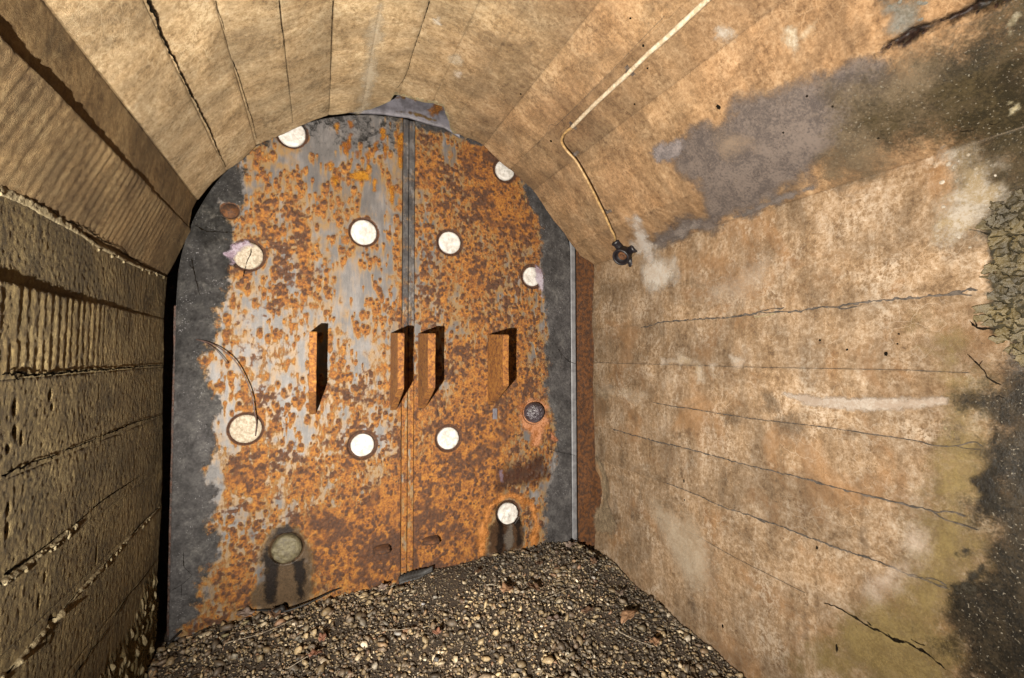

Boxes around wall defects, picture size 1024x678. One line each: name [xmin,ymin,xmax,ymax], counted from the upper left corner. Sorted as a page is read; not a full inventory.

crack [147,0,226,167]
rust [327,121,404,191]
leakage [631,0,1024,290]
crack [641,288,999,330]
peeling [971,188,1024,367]
rust [476,399,558,556]
crack [610,428,977,530]
crack [657,517,946,670]
leakage [815,353,1024,678]